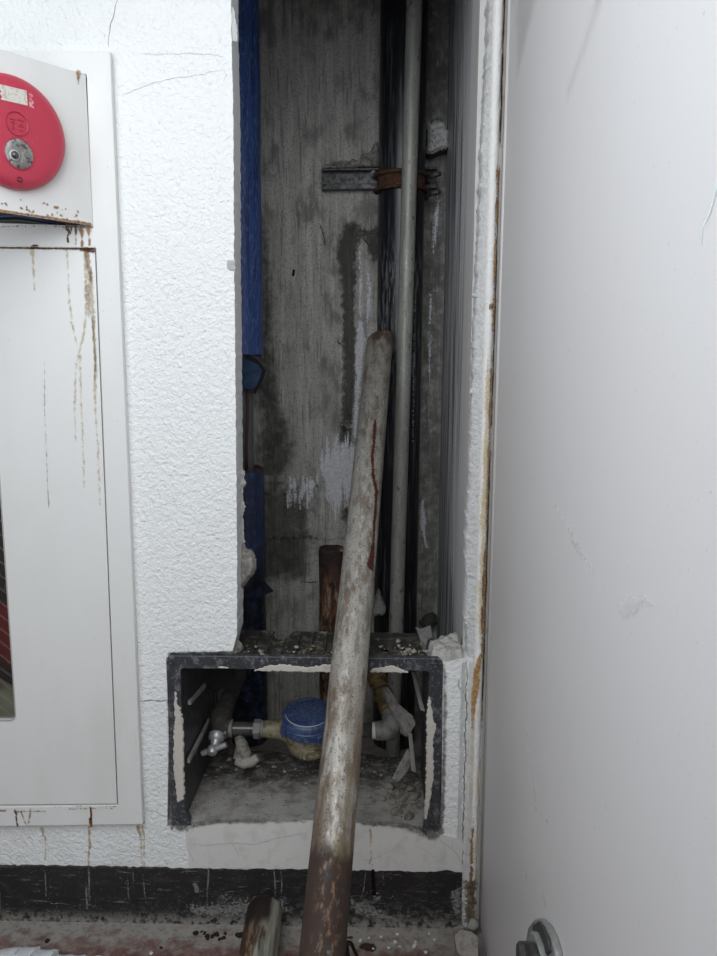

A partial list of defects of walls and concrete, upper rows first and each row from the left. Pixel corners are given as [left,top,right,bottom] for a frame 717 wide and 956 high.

crack [123,53,226,95]
corrosion [489,165,499,332]
water stain [262,223,378,577]
corrosion [469,356,492,793]
corrosion [0,806,117,864]
corrosion [463,820,478,924]